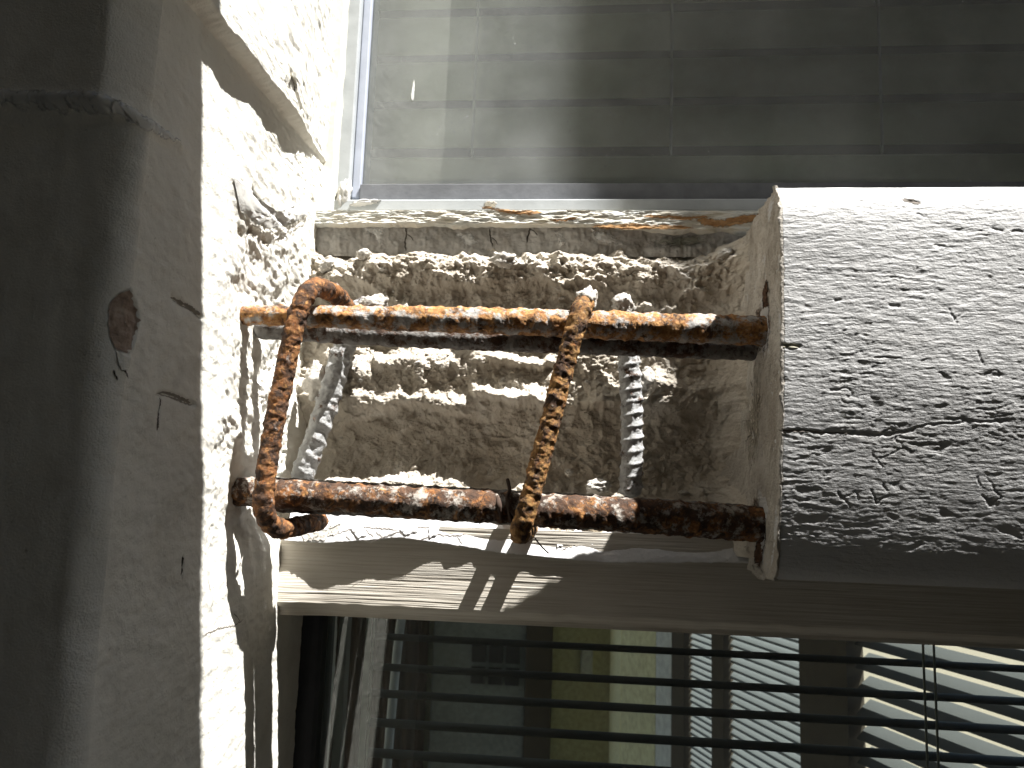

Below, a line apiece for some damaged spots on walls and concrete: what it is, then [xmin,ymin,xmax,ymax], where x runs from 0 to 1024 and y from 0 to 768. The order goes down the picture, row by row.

corrosion [482,206,577,222]
corrosion [594,214,758,230]
spalling [108,290,141,370]
spalling [240,303,291,340]
corrosion [755,280,770,350]
spalling [274,238,768,558]
crack [780,427,854,435]
spalling [231,476,255,507]
corrosion [754,522,766,567]